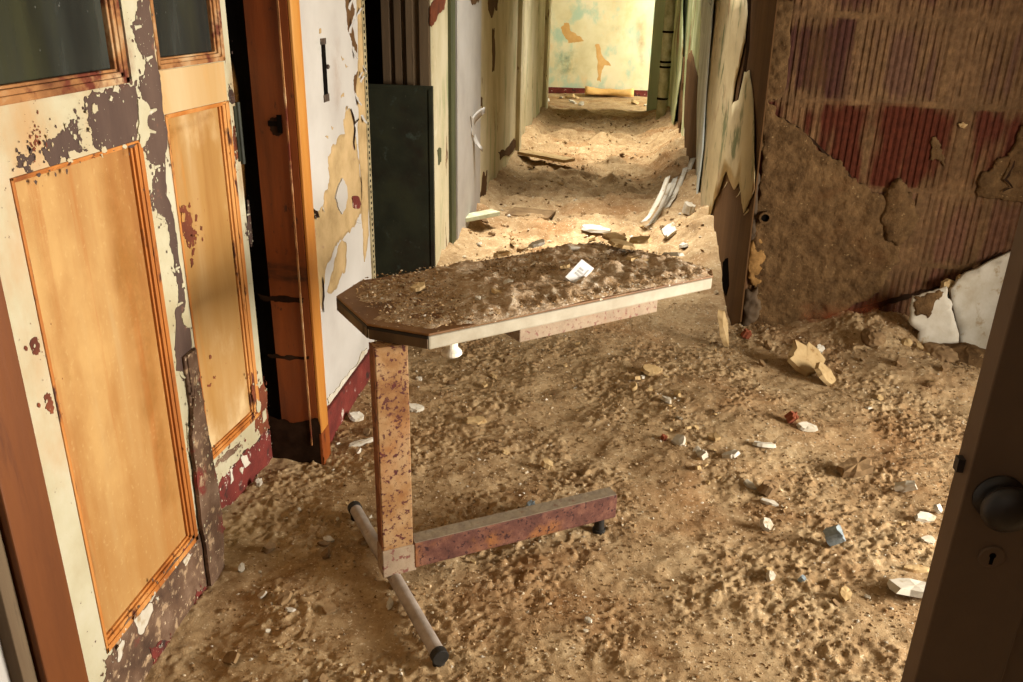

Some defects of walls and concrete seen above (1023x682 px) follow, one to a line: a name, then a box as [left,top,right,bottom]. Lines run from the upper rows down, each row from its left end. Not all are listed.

spalling [561,23,584,43]
spalling [595,44,611,82]
spalling [314,0,369,309]
peeling [670,0,793,326]
spalling [940,274,961,292]
peeling [9,0,243,682]
peeling [247,371,270,443]